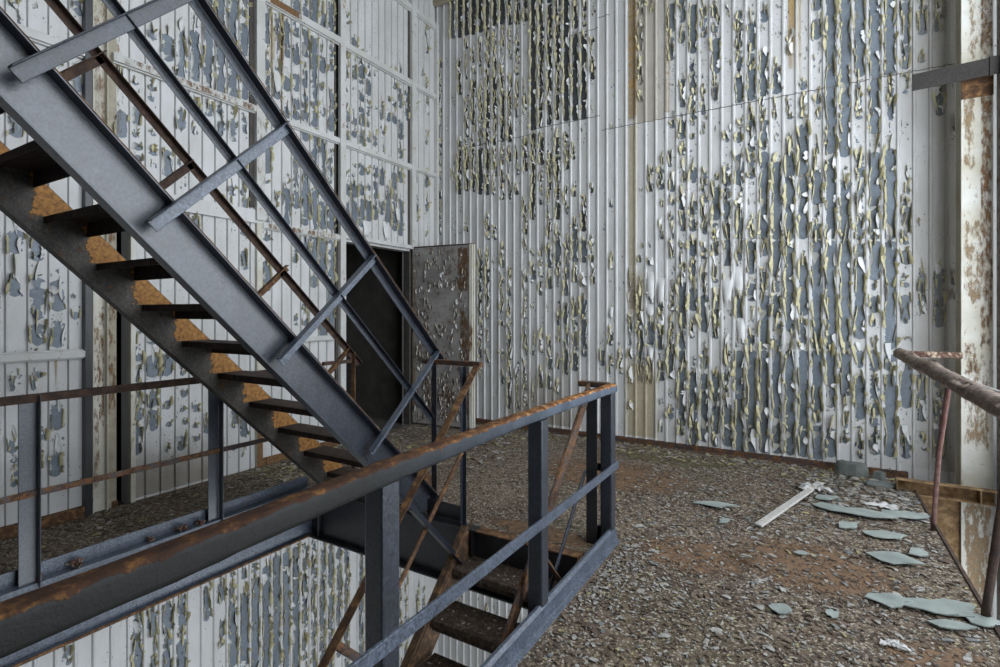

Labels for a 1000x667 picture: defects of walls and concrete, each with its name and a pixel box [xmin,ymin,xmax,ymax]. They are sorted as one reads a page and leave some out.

peeling [147,12,251,142]
rust [970,0,992,58]
rust [29,172,72,216]
peeling [206,0,605,422]
peeling [599,0,955,460]
rust [964,96,993,386]
peeling [131,328,208,458]
rust [82,223,271,403]
rust [184,212,401,453]
peeling [131,593,191,667]
peeling [203,539,365,667]
rust [963,504,991,598]